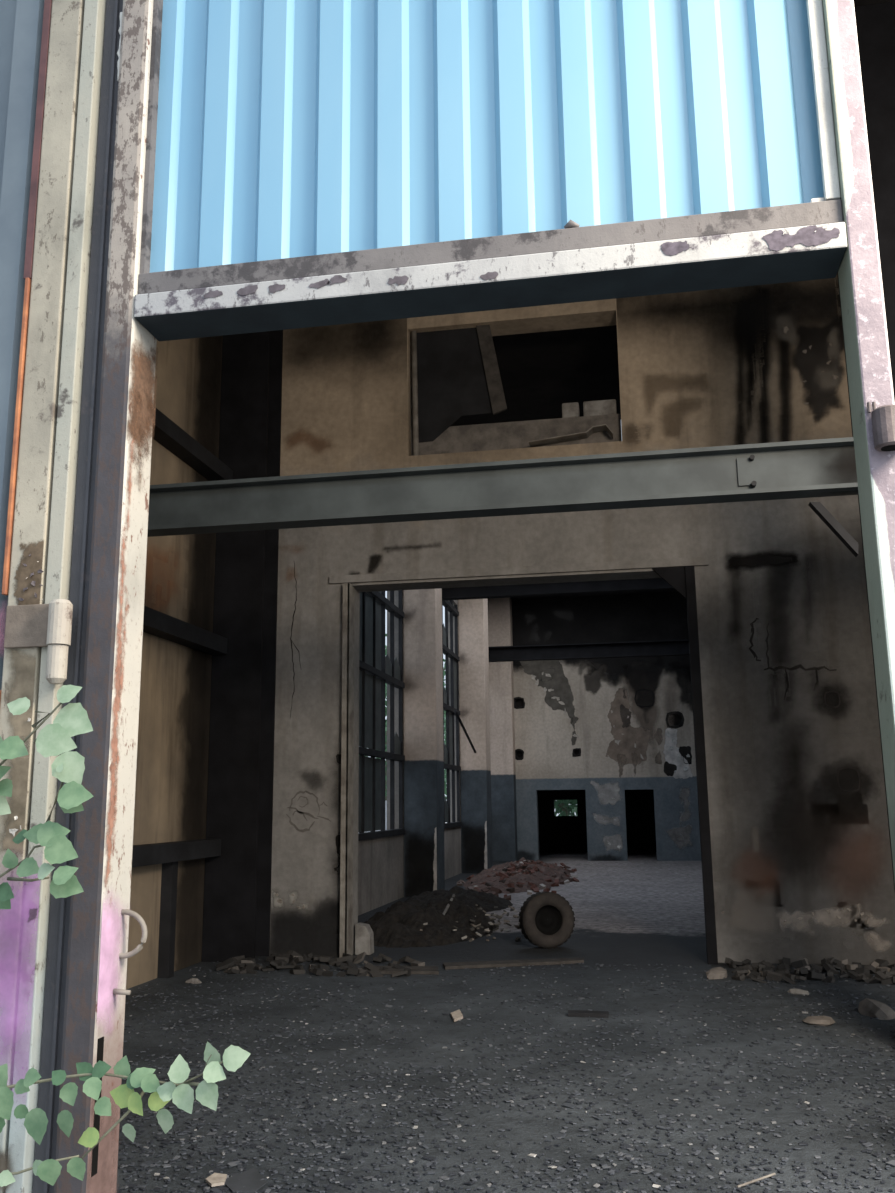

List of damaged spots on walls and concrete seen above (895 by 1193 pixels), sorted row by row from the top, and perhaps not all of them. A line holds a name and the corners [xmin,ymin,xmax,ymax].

peeling [237,284,285,295]
peeling [309,275,347,289]
peeling [661,241,694,256]
peeling [762,225,840,251]
corrosion [127,347,157,500]
water stain [746,340,791,443]
corrosion [105,515,129,884]
peeling [520,660,581,757]
water stain [584,665,603,694]
water stain [624,659,693,741]
crack [749,618,837,700]
spalling [590,688,693,851]